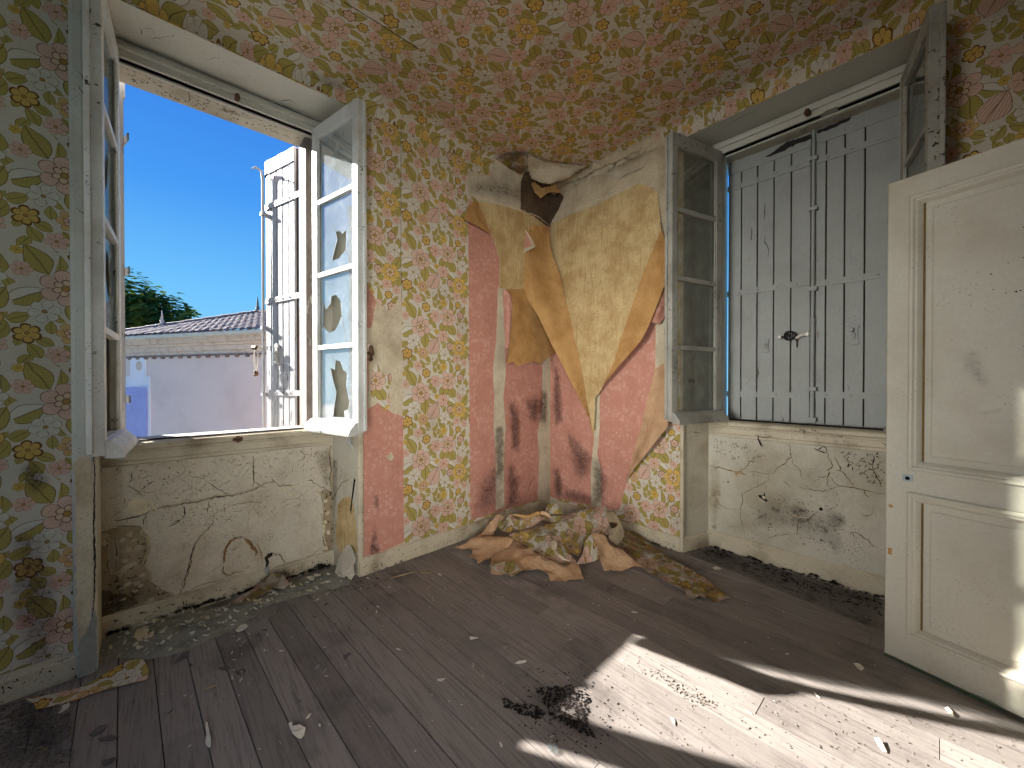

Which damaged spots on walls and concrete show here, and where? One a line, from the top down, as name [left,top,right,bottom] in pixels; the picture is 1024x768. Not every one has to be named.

flaking render [468,157,525,210]
flaking render [551,135,665,235]
peeling [766,107,851,157]
crack [92,452,355,618]
spalling [72,445,378,644]
water stain [478,405,520,510]
crack [698,435,885,547]